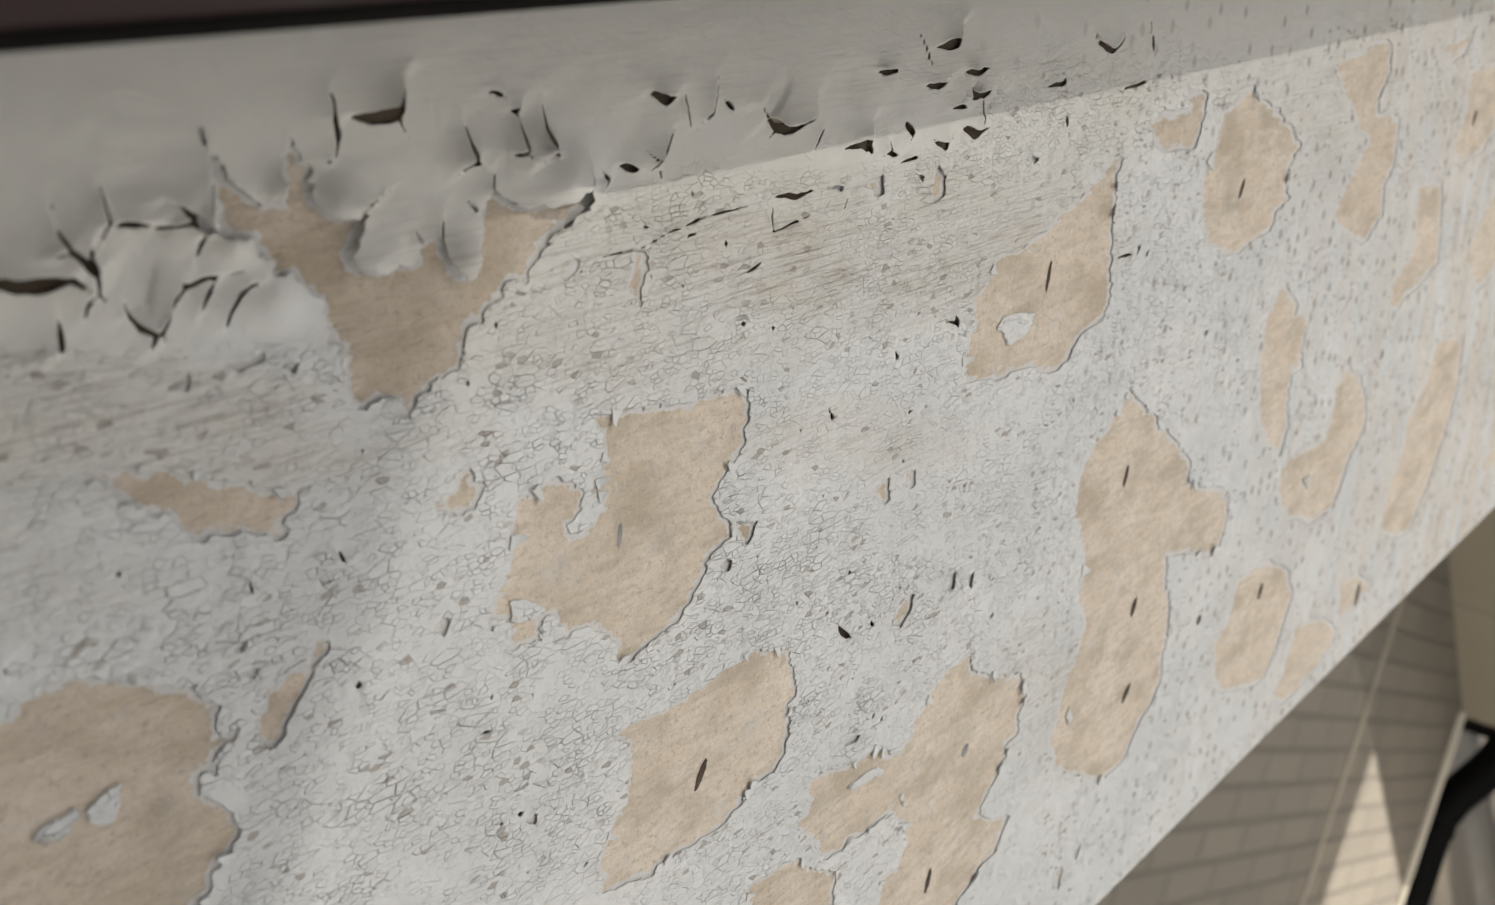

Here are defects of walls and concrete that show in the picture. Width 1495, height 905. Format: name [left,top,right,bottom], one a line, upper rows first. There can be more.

peeling [195,126,595,420]
spalling [869,175,884,197]
spalling [919,166,946,203]
peeling [962,154,1124,384]
peeling [1145,84,1301,258]
peeling [78,464,300,543]
peeling [489,384,757,665]
peeling [1049,390,1228,785]
peeling [1212,559,1371,705]
peeling [0,641,330,905]
peeling [597,646,797,893]
peeling [745,656,1027,905]